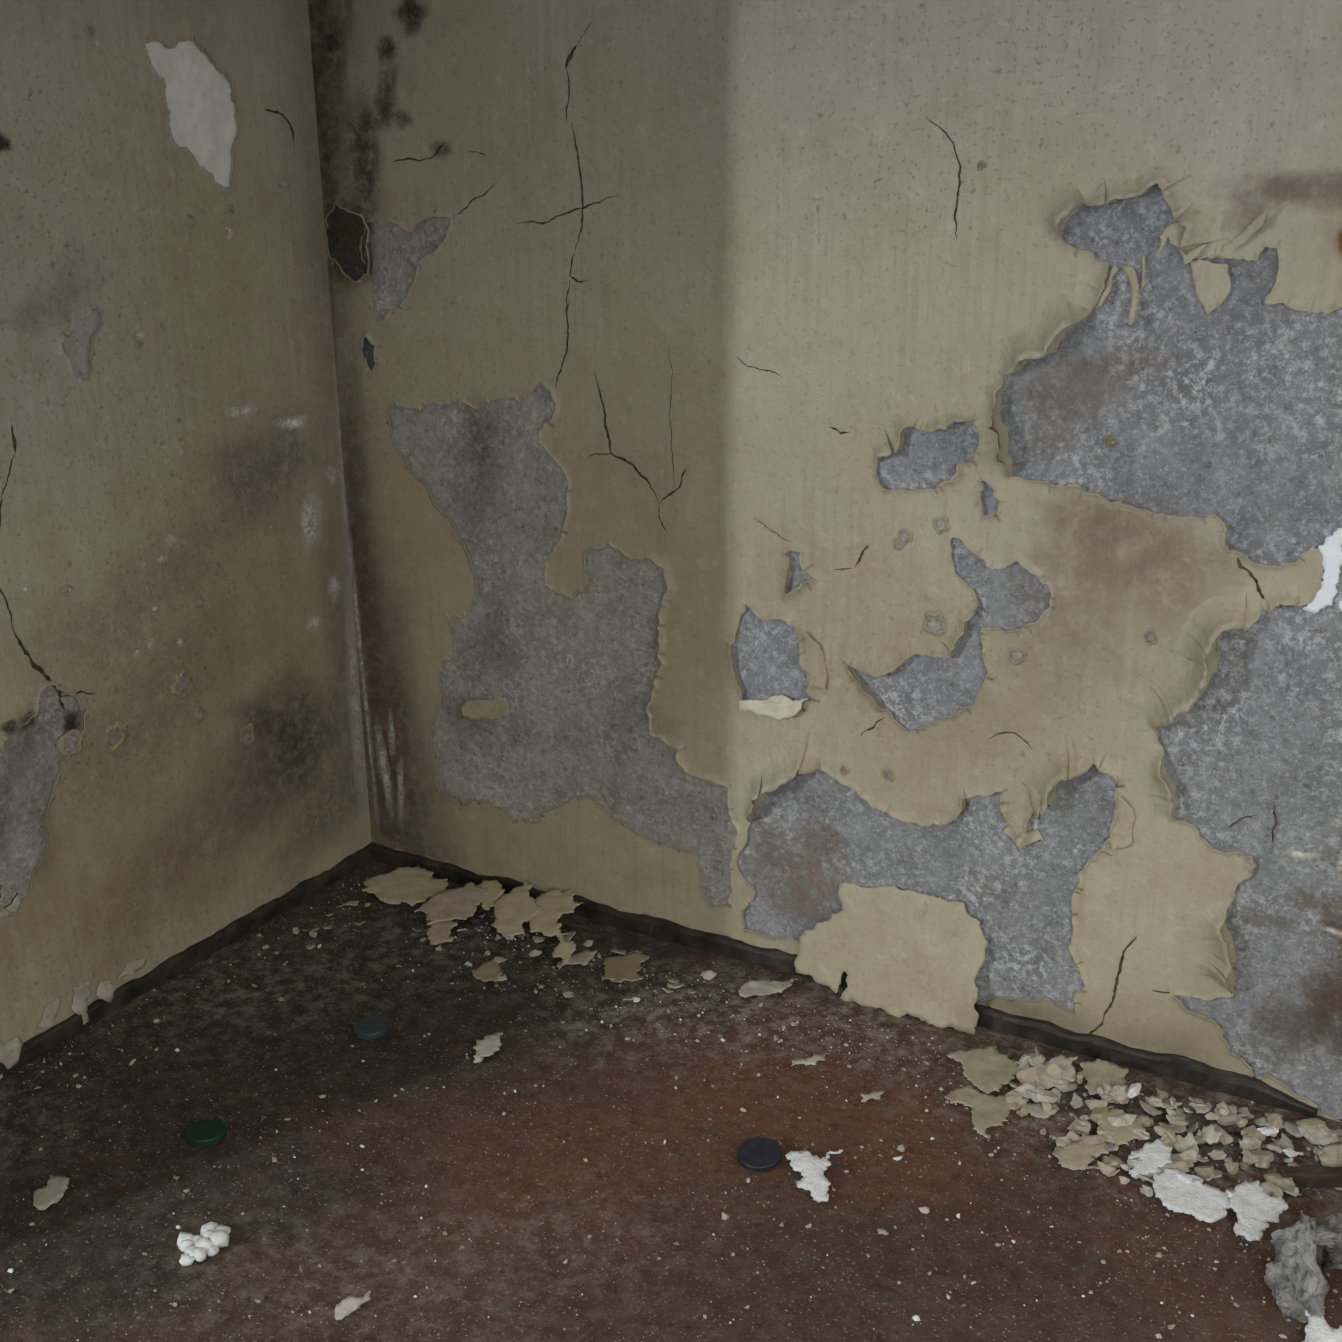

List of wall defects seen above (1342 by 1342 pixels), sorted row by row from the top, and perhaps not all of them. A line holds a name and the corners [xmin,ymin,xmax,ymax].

peeling [142,34,241,192]
damp [311,0,370,281]
peeling [324,199,454,381]
crack [518,22,615,387]
crack [0,425,17,527]
damp [280,416,304,429]
crack [588,346,687,530]
crack [0,589,97,710]
damp [351,589,413,807]
peeling [385,156,1342,1142]
peeling [0,679,89,919]
peeling [0,1036,23,1079]